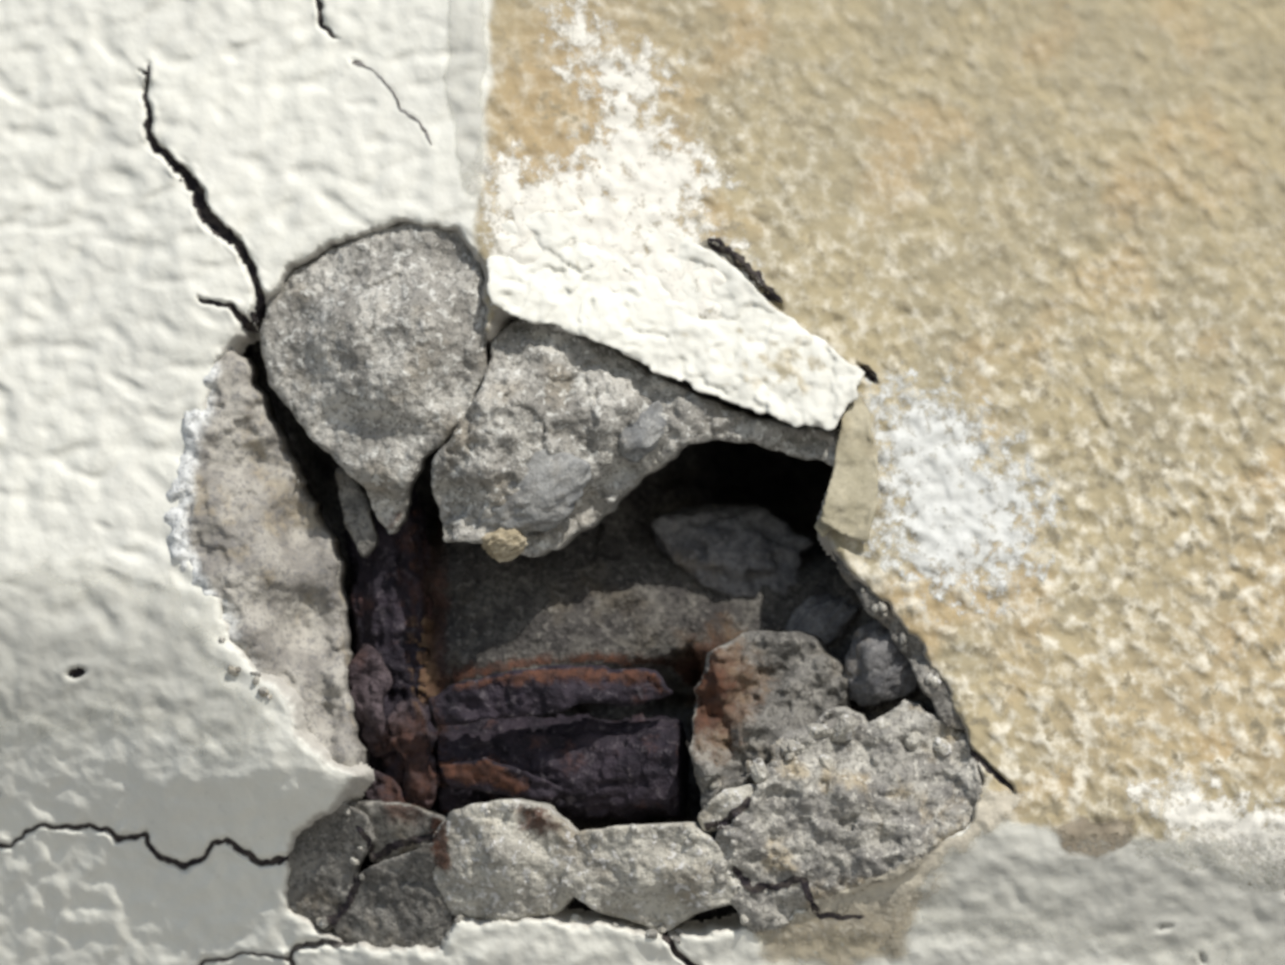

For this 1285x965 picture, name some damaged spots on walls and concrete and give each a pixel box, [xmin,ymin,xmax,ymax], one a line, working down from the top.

crack [316,0,432,145]
crack [142,64,266,333]
spalling [163,0,1024,949]
rust [379,509,753,869]
crack [0,823,290,870]
crack [199,826,439,965]
crack [662,931,696,965]